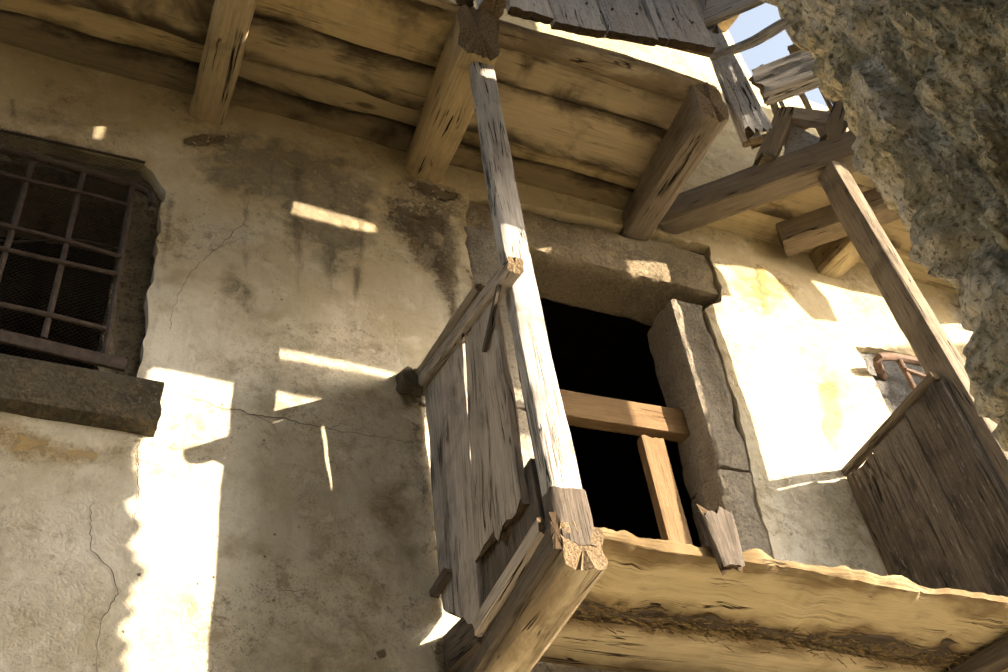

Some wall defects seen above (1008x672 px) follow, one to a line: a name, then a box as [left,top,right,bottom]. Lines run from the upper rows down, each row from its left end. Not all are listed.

crack [170,196,252,329]
leakage [209,135,372,271]
leakage [387,179,458,314]
crack [134,437,149,525]
crack [177,392,415,443]
crack [89,503,118,667]